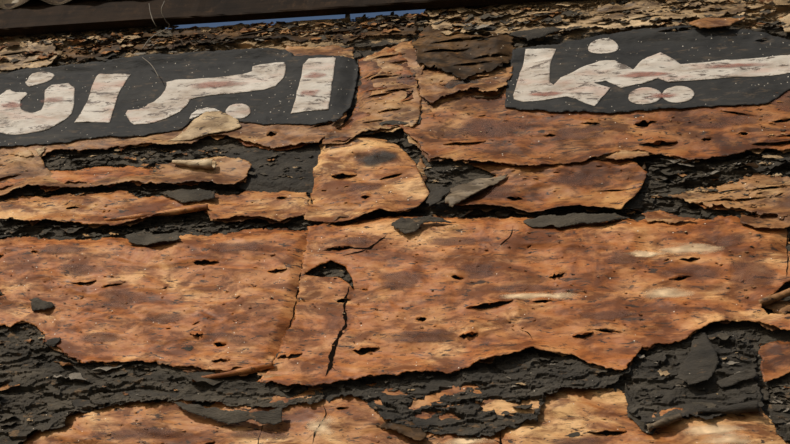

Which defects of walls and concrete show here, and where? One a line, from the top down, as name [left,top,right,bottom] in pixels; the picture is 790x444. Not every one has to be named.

peeling [0,0,790,65]
spalling [0,187,110,198]
peeling [0,216,311,239]
peeling [44,142,322,195]
spalling [388,205,569,219]
spalling [595,149,790,215]
crack [289,263,303,328]
crack [325,287,349,376]
peeling [0,322,790,444]